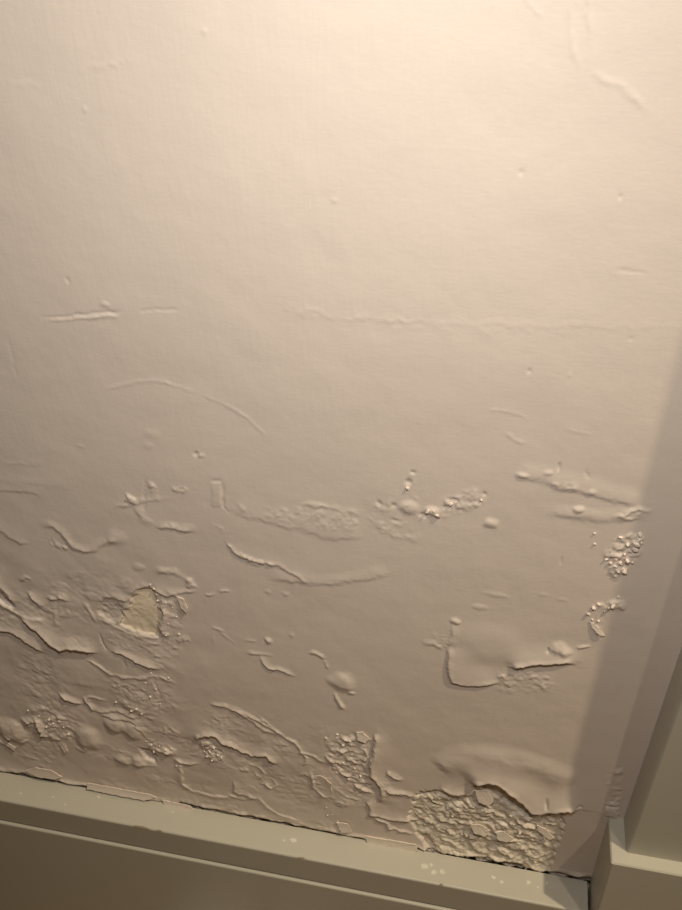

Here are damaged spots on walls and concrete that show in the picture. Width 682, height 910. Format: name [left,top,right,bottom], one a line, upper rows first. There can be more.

spalling [397,469,488,520]
spalling [604,531,646,577]
spalling [586,596,629,636]
spalling [0,574,378,823]
spalling [408,766,582,872]